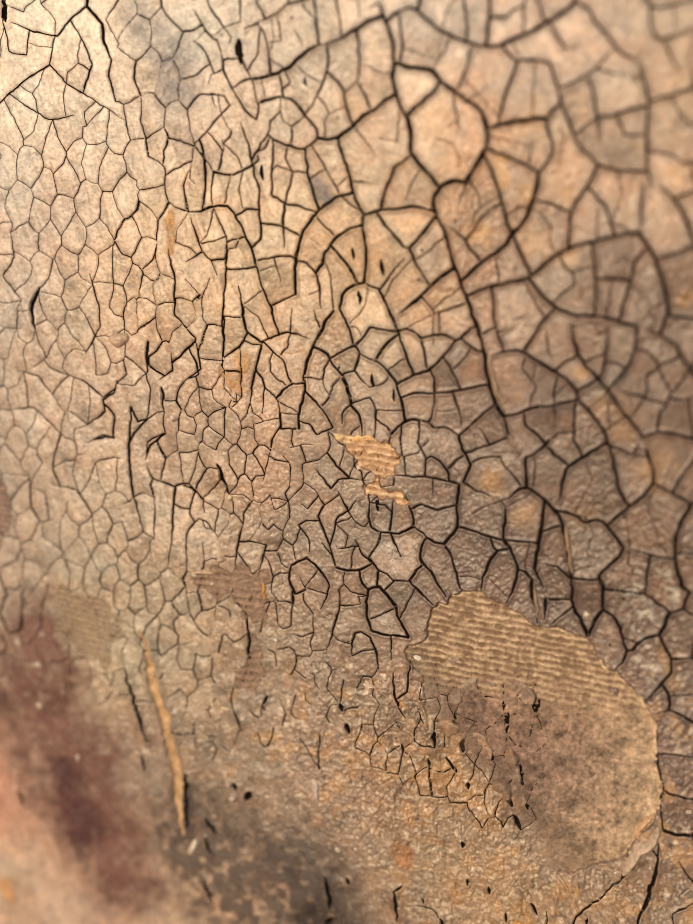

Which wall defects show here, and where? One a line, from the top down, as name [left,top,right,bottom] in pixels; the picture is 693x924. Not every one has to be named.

crack [0,0,124,125]
crack [3,233,21,300]
crack [85,274,100,354]
crack [9,358,92,526]
crack [69,375,267,567]
peeling [334,433,409,506]
crack [141,0,693,924]
crack [0,577,23,654]
peeling [408,591,663,868]